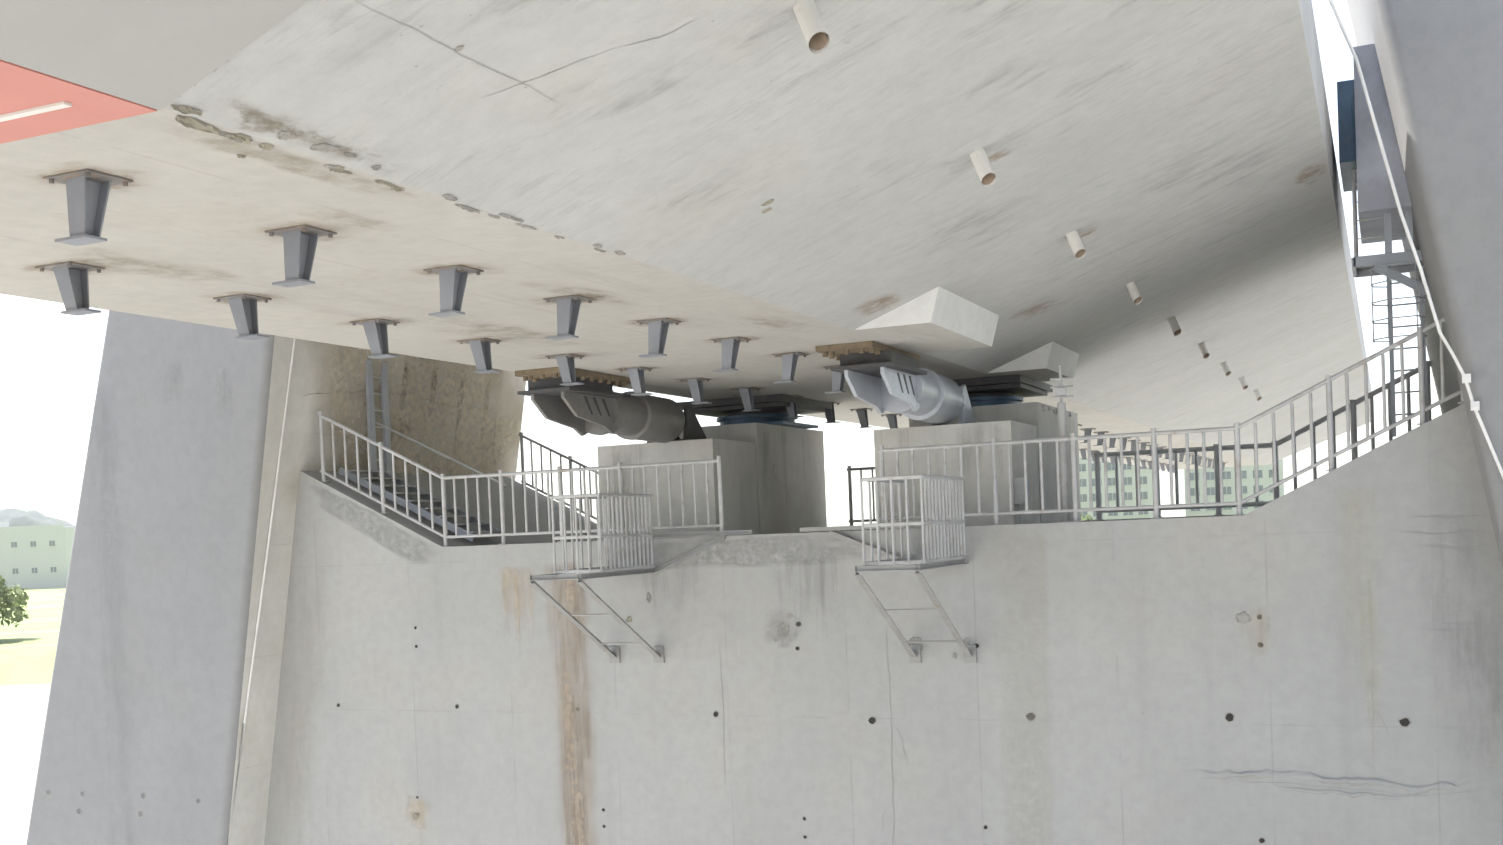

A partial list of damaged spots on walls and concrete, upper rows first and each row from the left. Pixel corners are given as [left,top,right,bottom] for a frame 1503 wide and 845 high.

crack [355,0,697,103]
spalling [170,105,291,159]
spalling [310,144,356,175]
spalling [371,165,404,192]